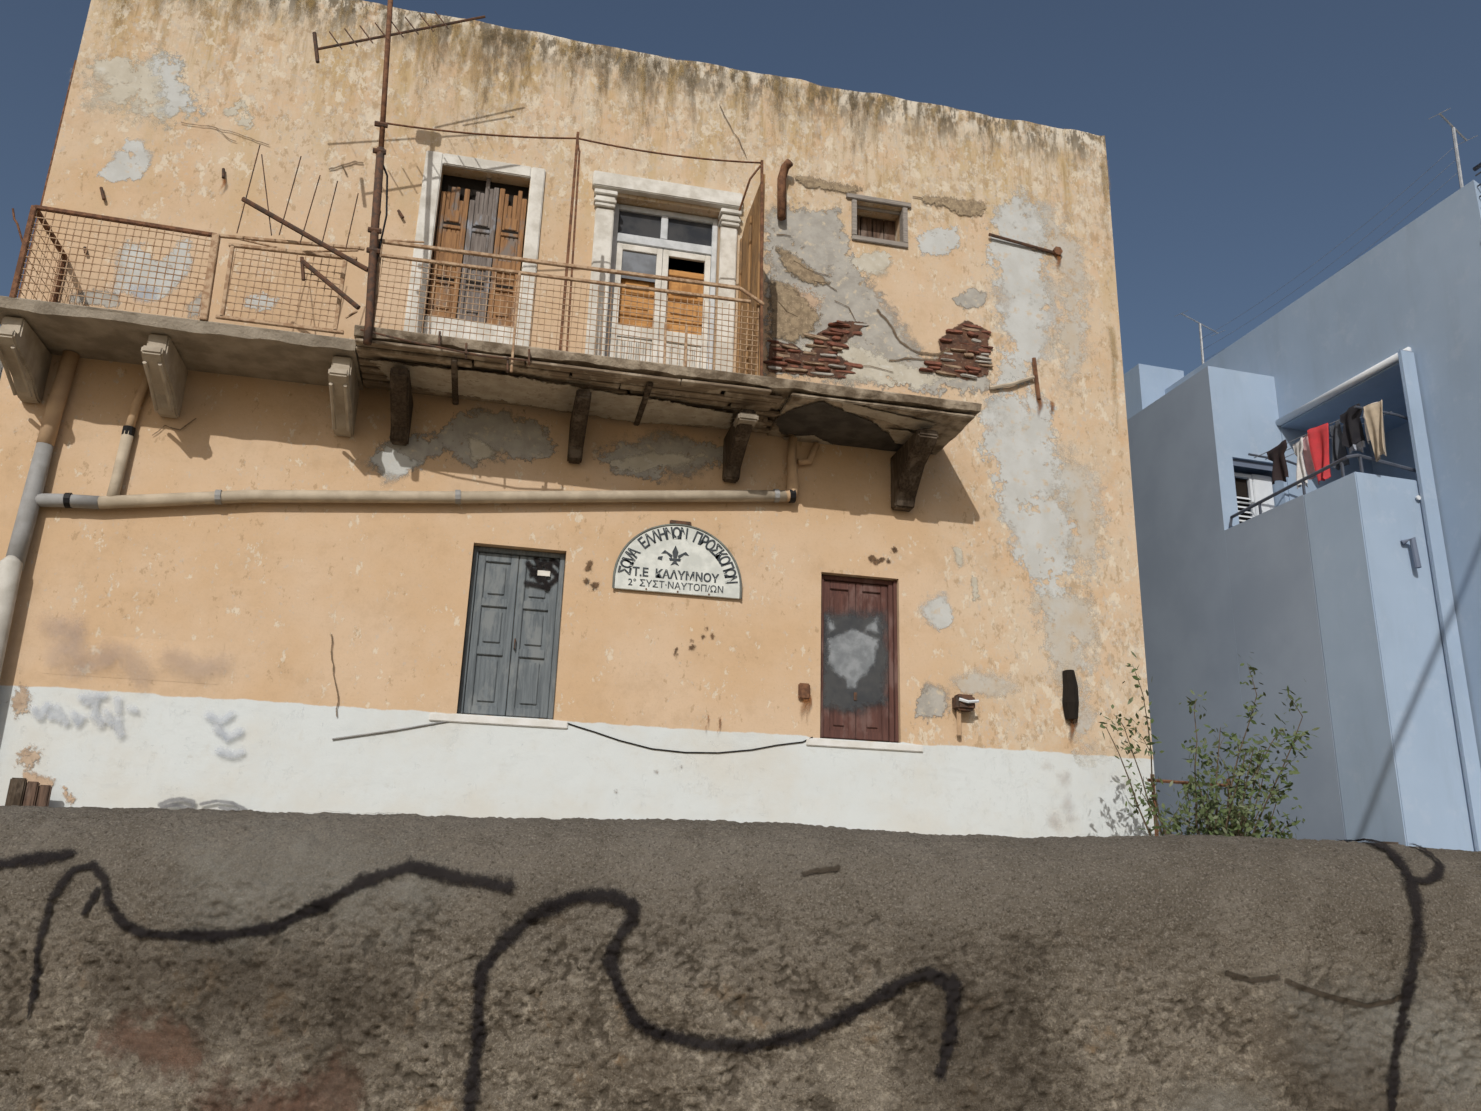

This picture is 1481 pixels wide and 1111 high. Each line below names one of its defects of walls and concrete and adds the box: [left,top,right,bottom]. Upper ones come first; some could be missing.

peeling [85,48,254,130]
peeling [96,137,152,183]
peeling [69,238,193,308]
peeling [245,291,280,312]
peeling [368,360,733,485]
peeling [763,175,1111,755]